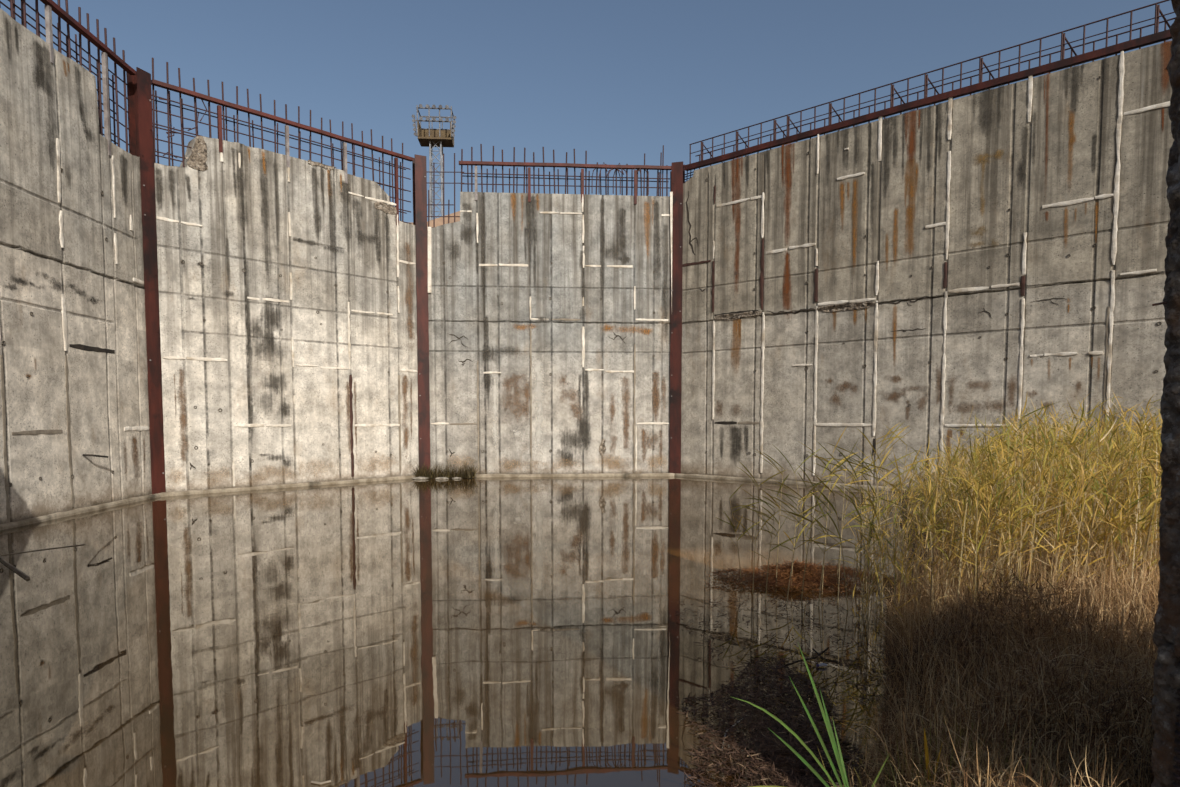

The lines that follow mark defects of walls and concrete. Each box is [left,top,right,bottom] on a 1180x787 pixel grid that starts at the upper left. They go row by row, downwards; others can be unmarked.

leakage [34,42,53,100]
spalling [152,58,411,224]
leakage [232,149,244,226]
leakage [261,160,278,233]
spalling [427,144,695,228]
leakage [600,199,630,282]
rust [732,156,743,284]
rust [781,142,794,310]
rust [840,180,857,263]
rust [886,109,921,262]
leakage [247,286,278,431]
leakage [265,376,290,416]